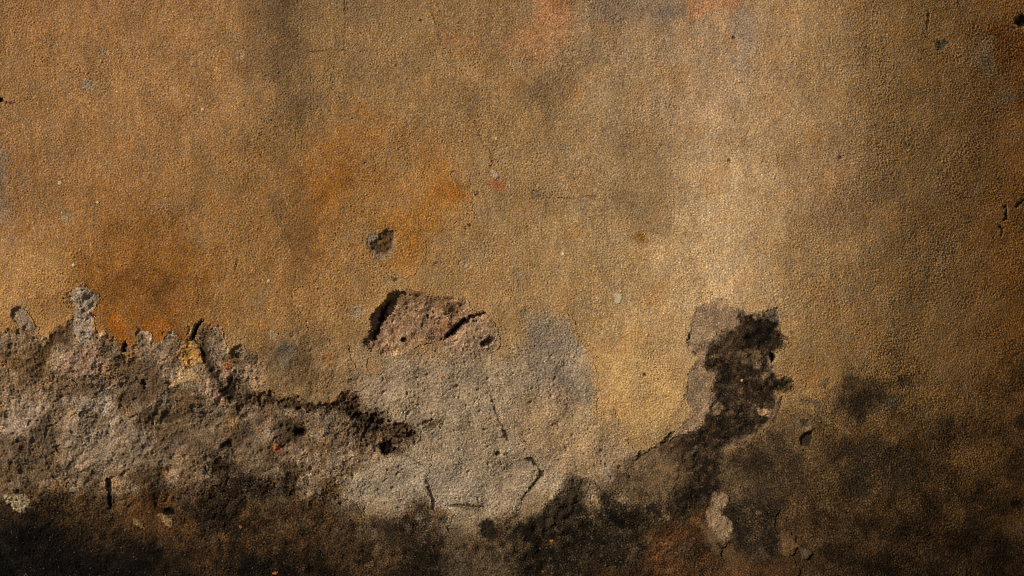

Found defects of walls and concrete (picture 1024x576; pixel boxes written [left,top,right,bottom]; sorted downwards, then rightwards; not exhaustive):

spalling [366,227,397,260]
spalling [0,283,650,535]
water stain [0,307,1024,576]
spalling [667,298,781,448]